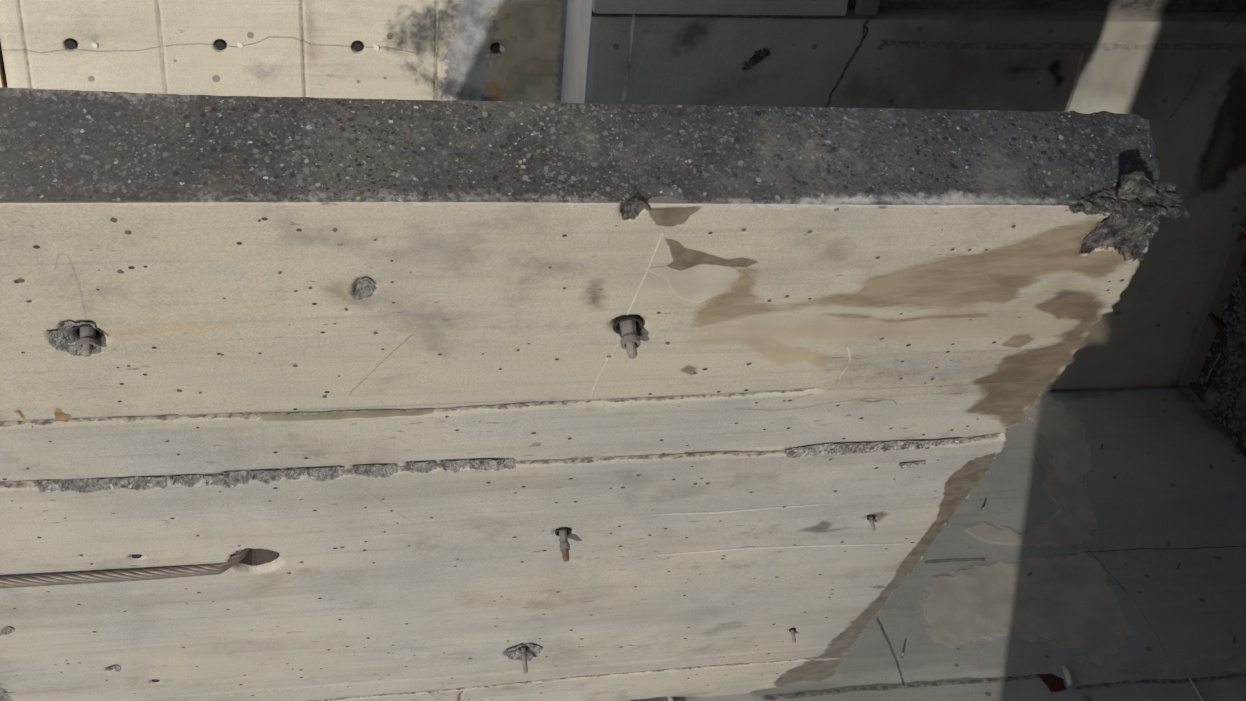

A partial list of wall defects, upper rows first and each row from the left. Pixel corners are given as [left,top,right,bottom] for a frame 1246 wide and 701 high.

water stain [896,3,1246,192]
efflorescence [778,192,1055,209]
spalling [1065,170,1190,262]
spalling [36,458,516,494]
water stain [647,205,1246,687]